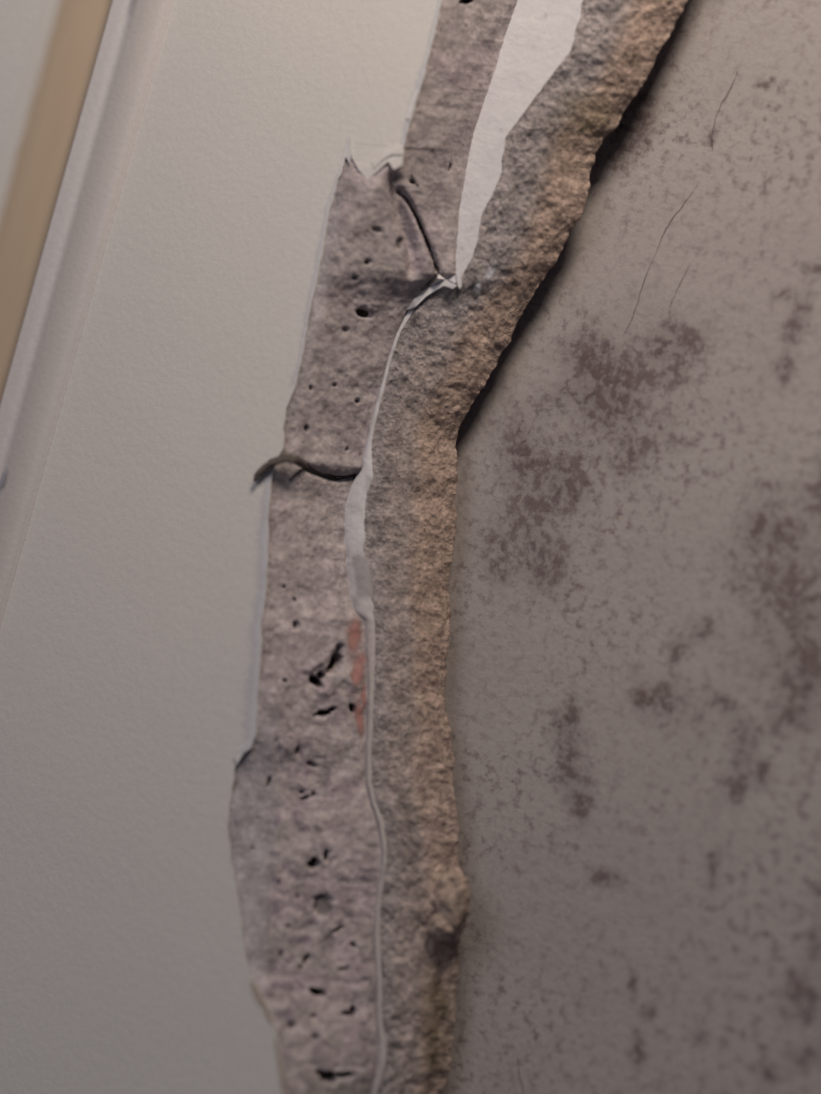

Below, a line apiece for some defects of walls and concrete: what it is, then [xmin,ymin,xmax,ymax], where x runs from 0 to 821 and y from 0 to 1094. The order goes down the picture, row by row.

water stain [571,329,701,425]
flaking render [228,0,688,1094]
water stain [493,429,587,584]
water stain [751,514,814,624]